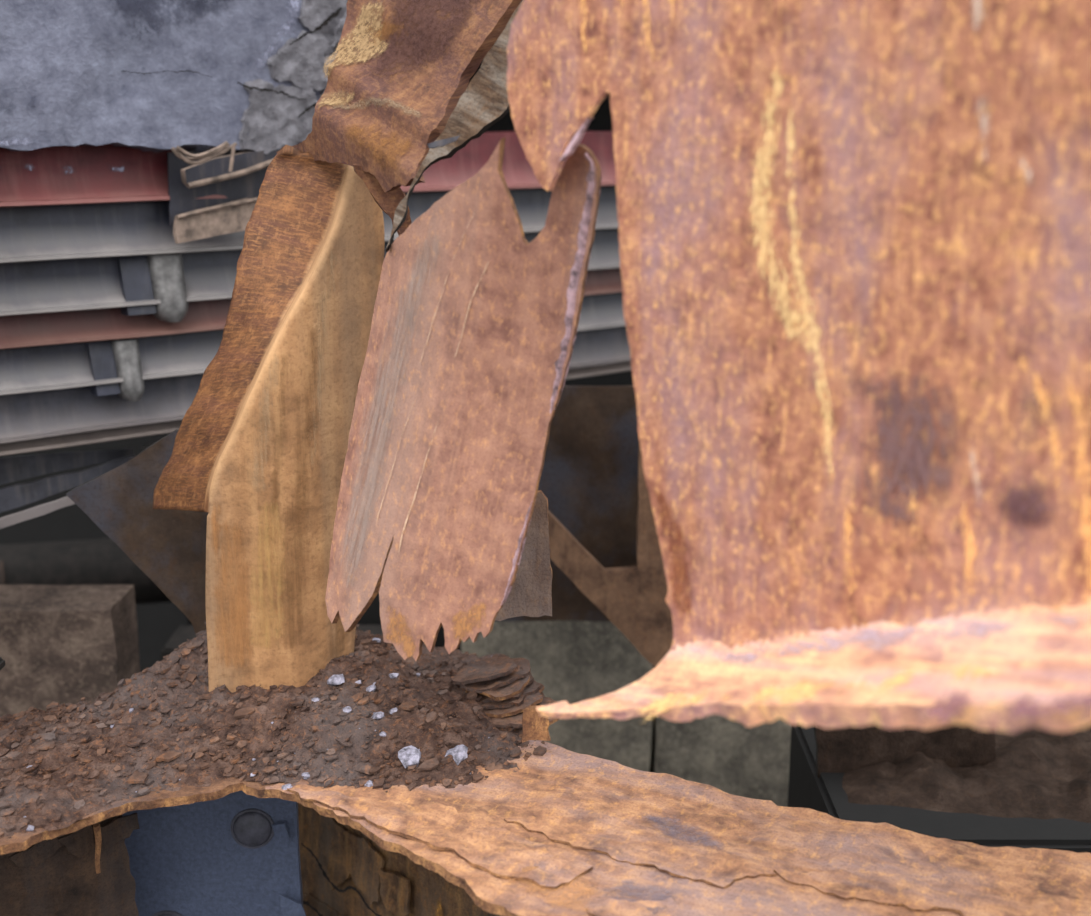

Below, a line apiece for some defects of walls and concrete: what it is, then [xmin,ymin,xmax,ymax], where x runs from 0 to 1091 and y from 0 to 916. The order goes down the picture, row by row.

crack [289,7,342,55]
corrosion [353,164,411,236]
corrosion [750,72,832,471]
corrosion [1022,363,1051,422]
corrosion [1000,486,1047,522]
corrosion [1070,387,1091,592]
corrosion [962,508,976,593]
corrosion [451,656,557,738]
corrosion [813,724,996,777]
crack [301,843,382,916]
corrosion [287,788,1091,916]